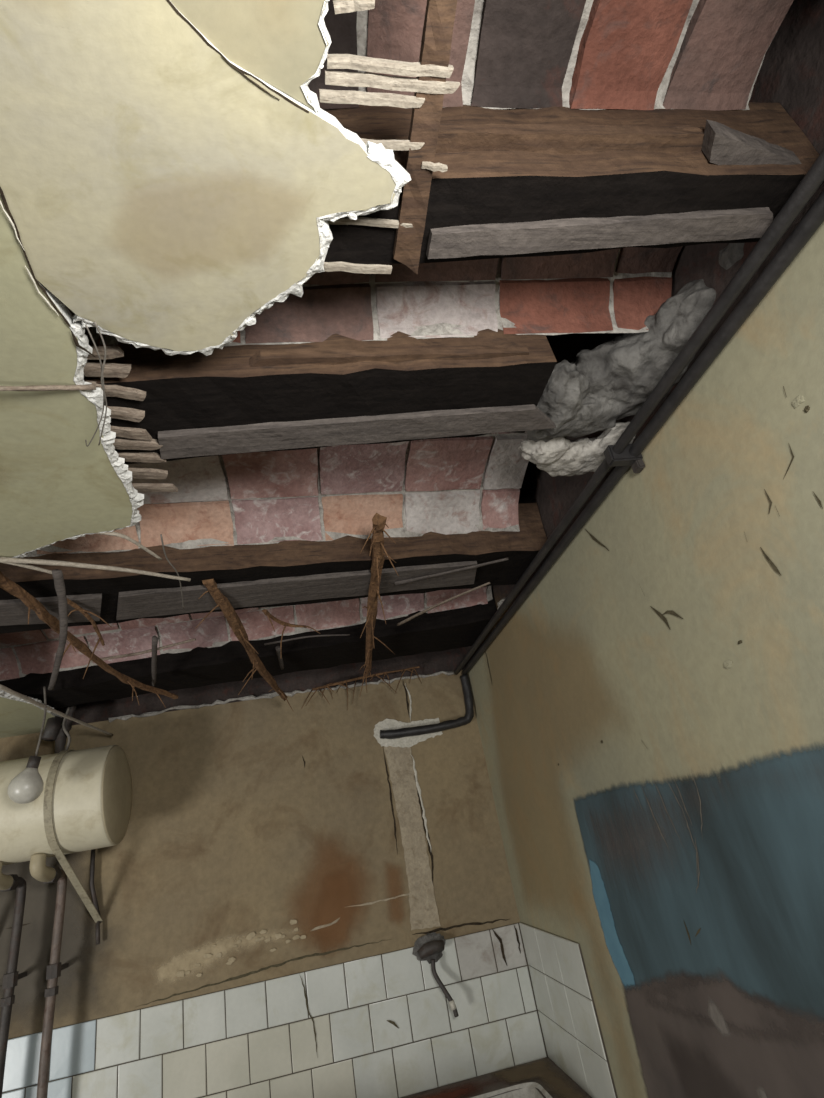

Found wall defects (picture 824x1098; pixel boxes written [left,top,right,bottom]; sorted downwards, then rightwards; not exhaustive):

crack [166,0,309,114]
spalling [301,0,331,114]
crack [0,187,95,357]
spalling [12,141,411,558]
spalling [0,689,54,713]
spalling [108,671,454,723]
crack [403,683,412,721]
crack [311,750,434,931]
peeling [157,919,306,981]
corrosion [302,857,361,947]
crack [300,976,318,1057]
flaking render [625,972,824,1098]